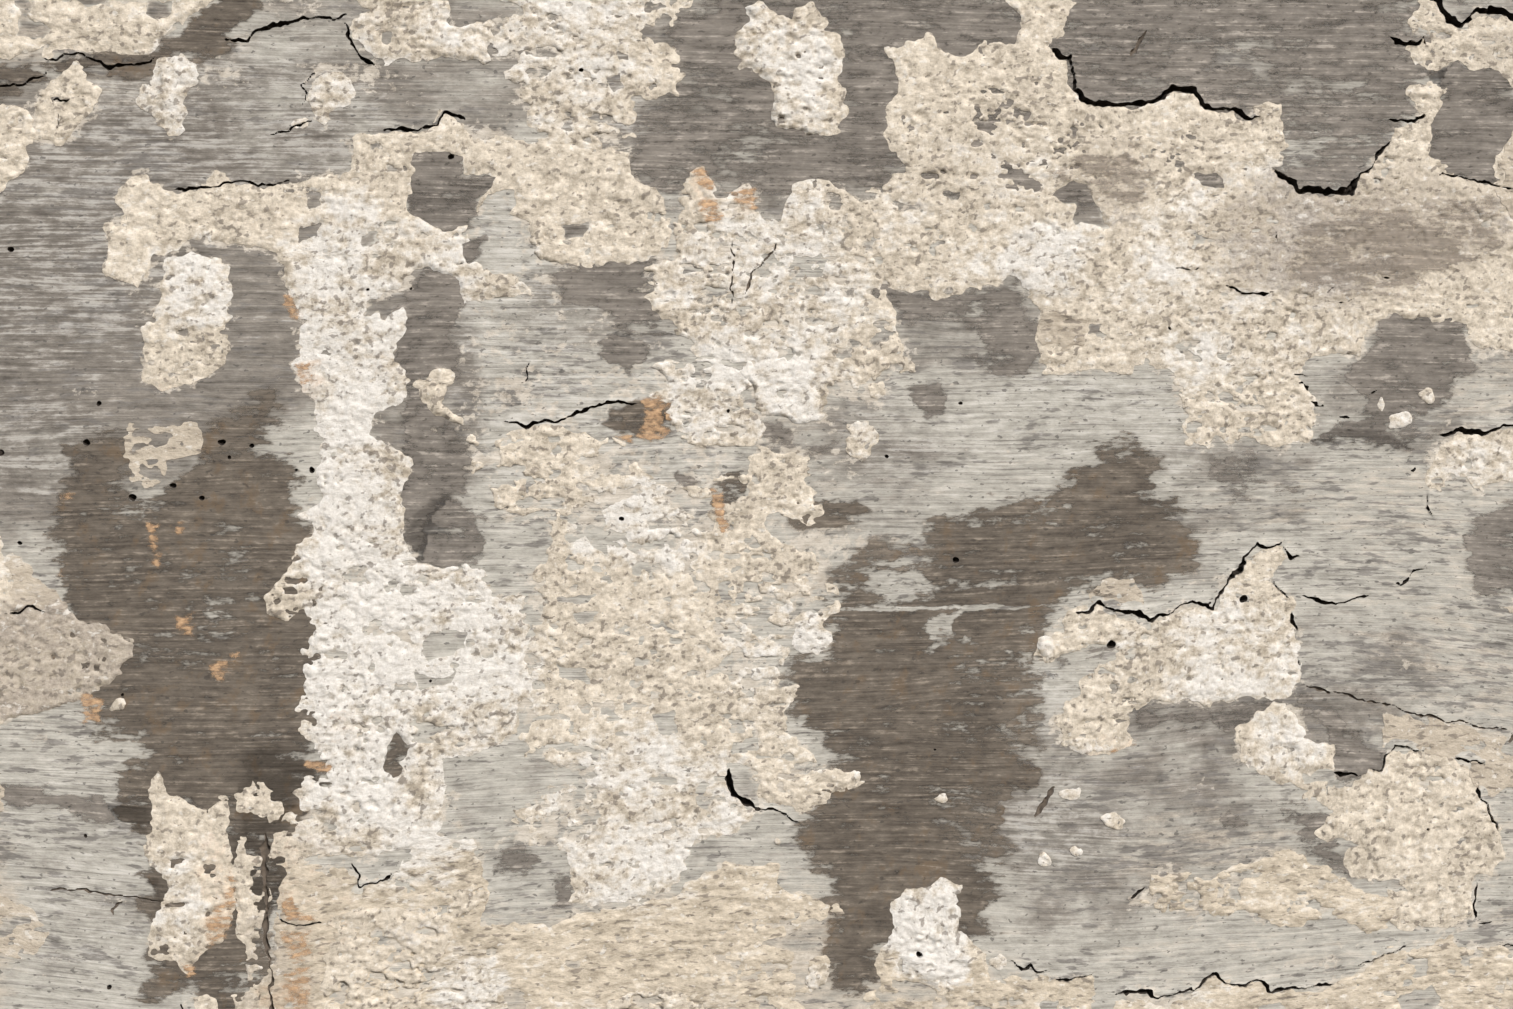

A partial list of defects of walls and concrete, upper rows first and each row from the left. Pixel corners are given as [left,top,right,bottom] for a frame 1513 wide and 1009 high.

crack [225,13,376,67]
crack [1390,0,1513,46]
crack [0,52,155,128]
crack [1052,48,1259,121]
crack [1274,114,1424,196]
crack [1439,173,1510,190]
flaking render [644,0,1513,449]
crack [504,400,637,429]
flaking render [102,0,865,1009]
crack [1076,542,1513,829]
crack [724,768,801,825]
crack [1011,946,1406,999]